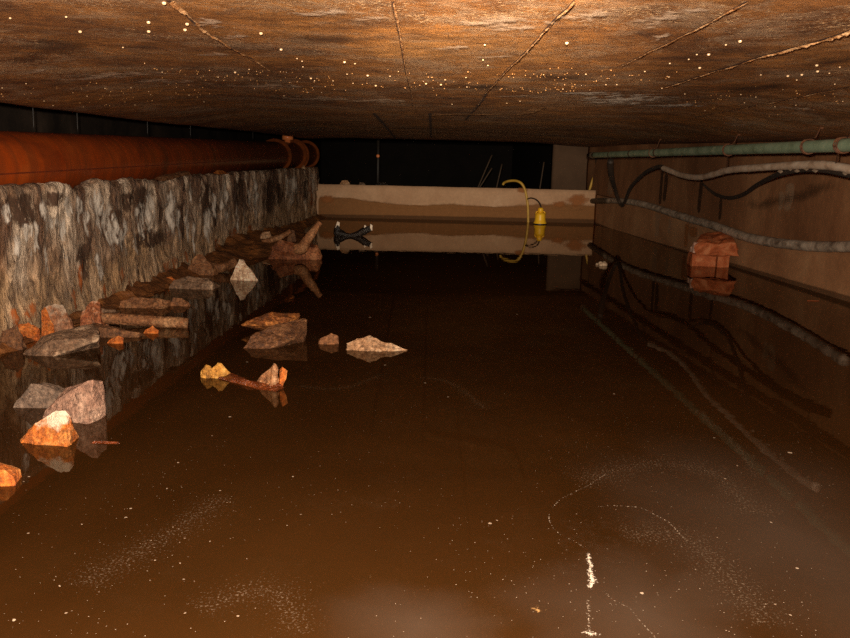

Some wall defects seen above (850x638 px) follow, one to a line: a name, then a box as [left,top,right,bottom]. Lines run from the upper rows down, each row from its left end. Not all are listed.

crack [166,0,272,72]
crack [391,0,576,138]
crack [621,1,748,66]
crack [665,30,850,88]
leakage [310,171,689,252]